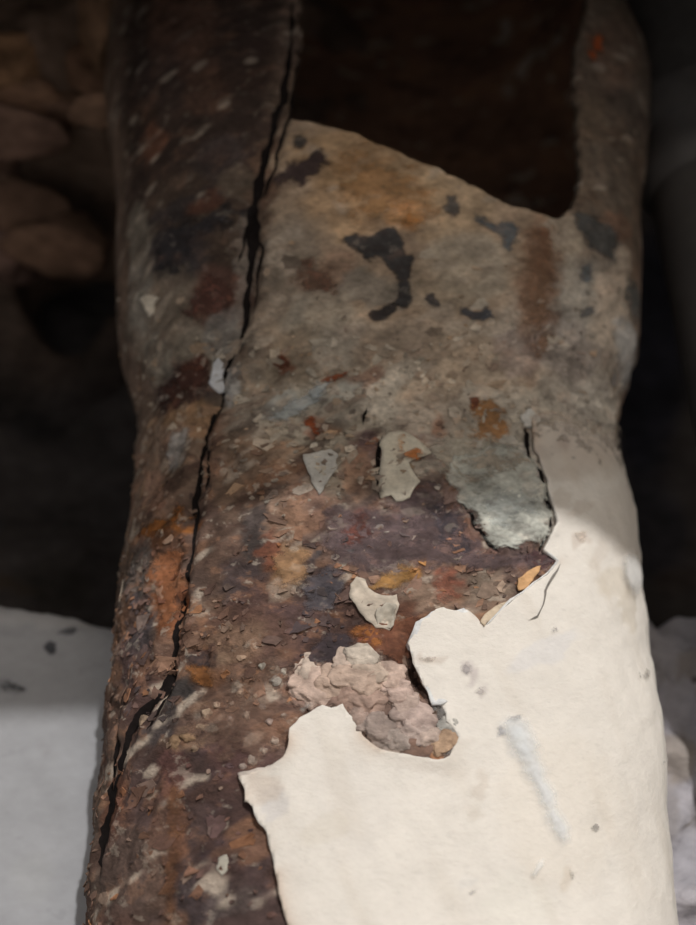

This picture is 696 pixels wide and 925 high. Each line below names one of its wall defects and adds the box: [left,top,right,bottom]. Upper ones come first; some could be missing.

damp [343,227,414,321]
damp [475,216,519,251]
damp [573,210,621,262]
crack [98,2,299,868]
corrosion [469,397,508,443]
peeling [379,431,553,549]
crack [523,422,552,552]
corrosion [309,616,418,668]
peeling [349,576,399,631]
corrosion [274,481,555,611]
crack [529,563,561,620]
spalling [269,643,458,759]